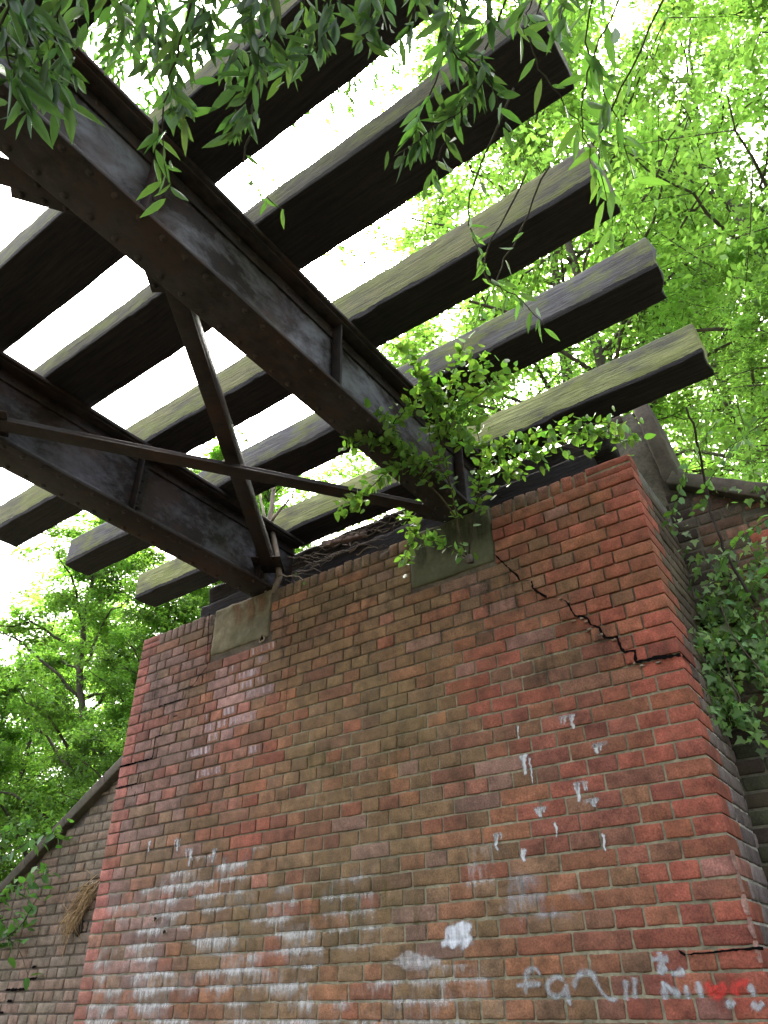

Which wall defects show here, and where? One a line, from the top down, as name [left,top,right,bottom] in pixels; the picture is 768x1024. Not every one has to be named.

crack [493,554,697,670]
crack [115,613,210,797]
leakage [520,754,533,783]
leakage [573,782,599,807]
leakage [113,838,246,919]
leakage [87,960,122,1024]
leakage [134,928,188,1024]
leakage [200,954,260,990]
leakage [254,917,321,968]
leakage [396,951,440,982]
leakage [441,921,472,950]
crack [678,946,764,956]